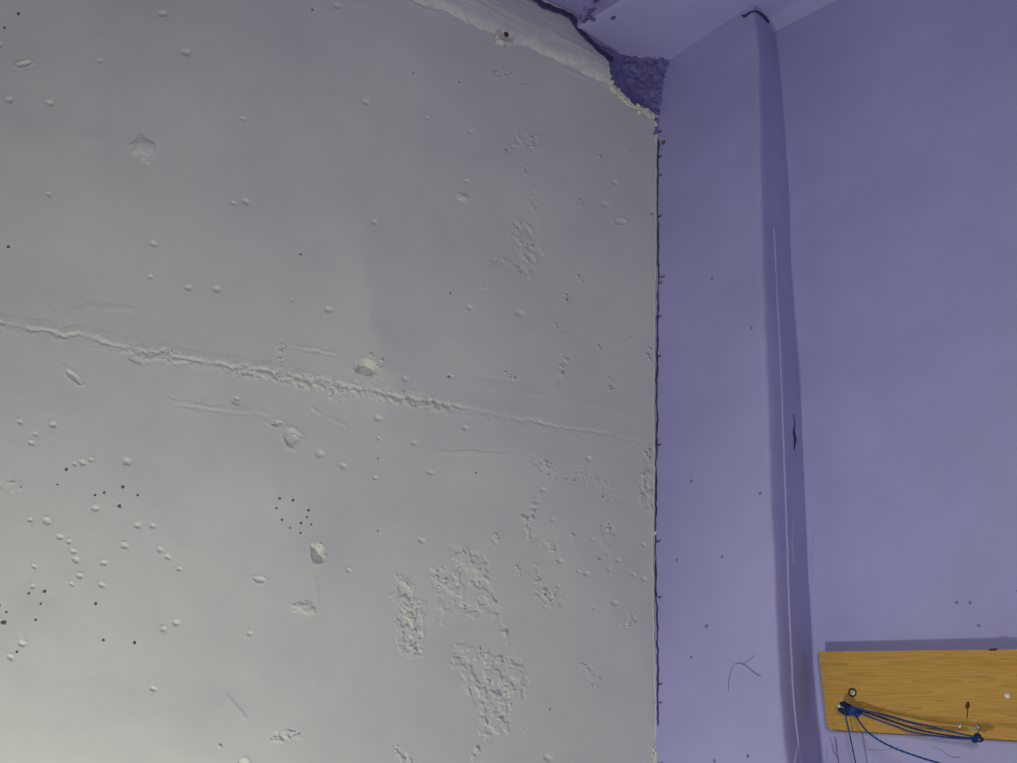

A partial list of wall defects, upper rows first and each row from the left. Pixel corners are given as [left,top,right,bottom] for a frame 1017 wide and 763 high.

spalling [593,40,670,145]
crack [654,130,665,725]
peeling [388,573,427,660]